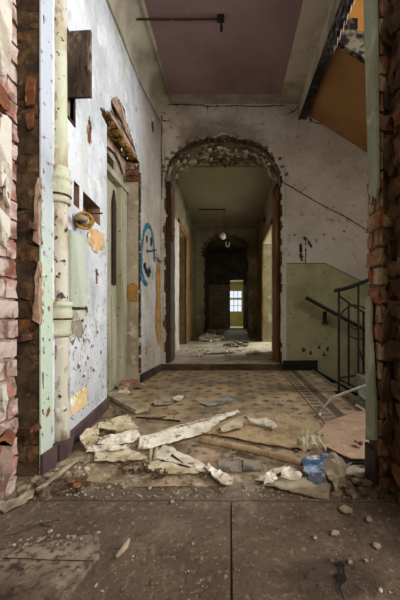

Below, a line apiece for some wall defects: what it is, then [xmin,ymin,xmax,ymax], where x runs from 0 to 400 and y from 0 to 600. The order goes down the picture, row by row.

crack [161,104,325,194]
crack [280,180,367,230]
spalling [15,0,46,477]
peeling [88,228,105,254]
spalling [161,134,288,364]
peeling [69,320,93,349]
peeling [70,355,95,419]